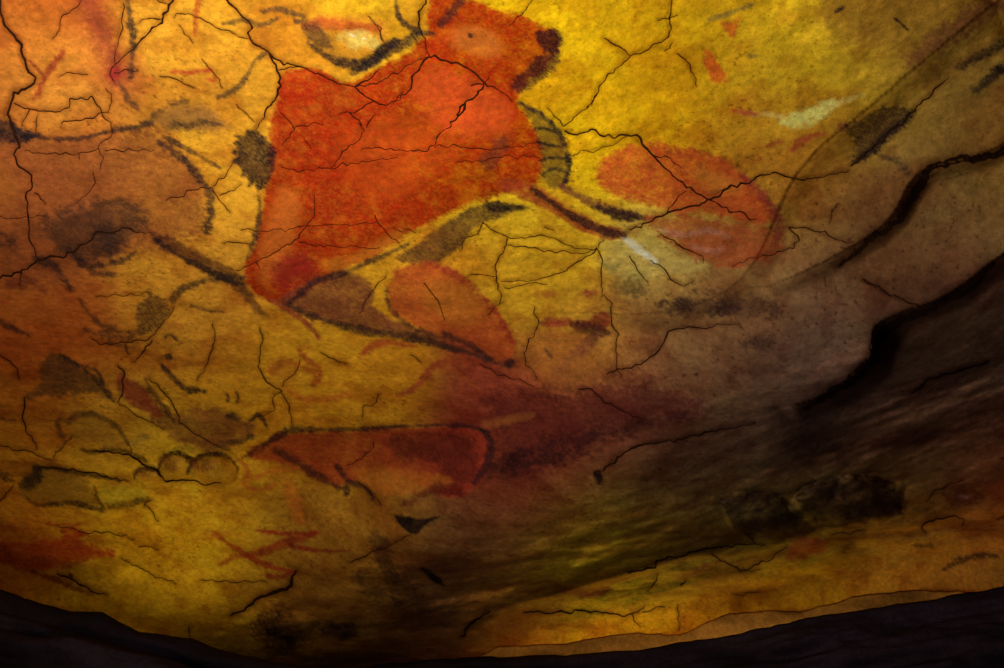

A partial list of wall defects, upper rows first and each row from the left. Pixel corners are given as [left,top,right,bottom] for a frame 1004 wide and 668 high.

crack [0,0,538,286]
crack [547,0,949,286]
crack [57,573,106,595]
crack [0,355,219,522]
crack [57,525,174,582]
crack [92,311,227,450]
crack [203,570,297,616]
crack [253,328,346,425]
crack [347,442,381,505]
crack [461,222,755,471]
crack [731,147,1004,411]
crack [921,480,964,532]